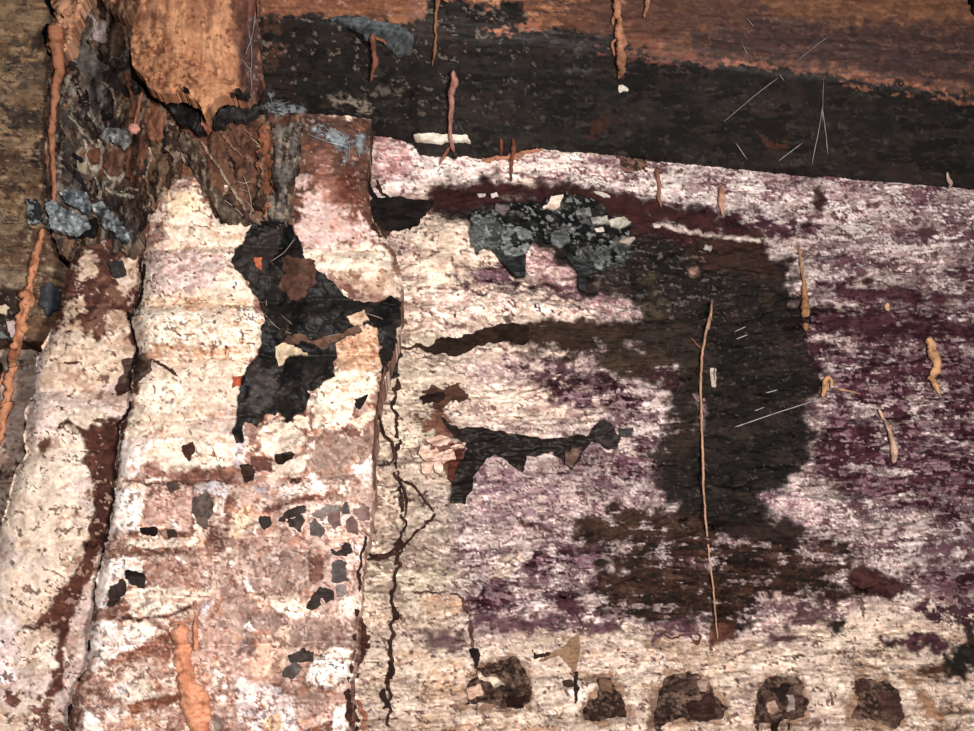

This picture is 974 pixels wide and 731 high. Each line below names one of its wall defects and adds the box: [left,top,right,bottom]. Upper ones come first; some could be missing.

crack [41,0,55,54]
leakage [265,92,305,117]
leakage [301,124,368,163]
crack [139,208,150,232]
peeling [232,309,369,414]
crack [77,257,179,681]
spalling [414,383,469,488]
leakage [428,171,974,682]
crack [344,367,475,731]
spalling [459,627,634,727]
spalling [647,669,729,731]
spalling [751,671,820,731]